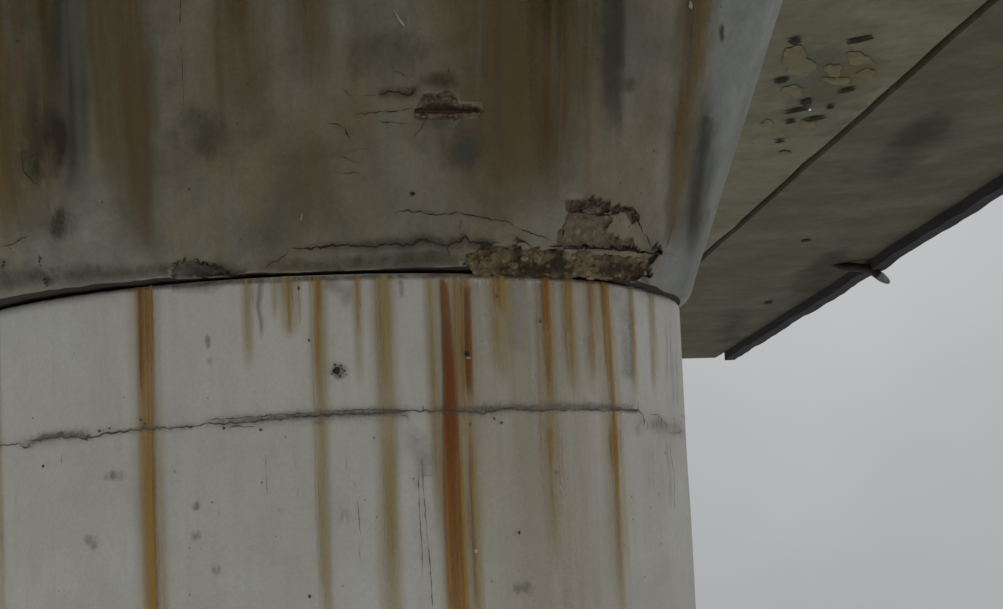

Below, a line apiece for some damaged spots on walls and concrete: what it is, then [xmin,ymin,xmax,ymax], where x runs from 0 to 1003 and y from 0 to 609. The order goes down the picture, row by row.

spalling [414,68,483,136]
peeling [760,37,876,130]
crack [260,209,549,269]
spalling [463,197,662,283]
corrosion [542,277,551,349]
corrosion [138,285,156,609]
crack [0,324,684,507]
corrosion [441,278,480,609]
corrosion [589,281,621,535]